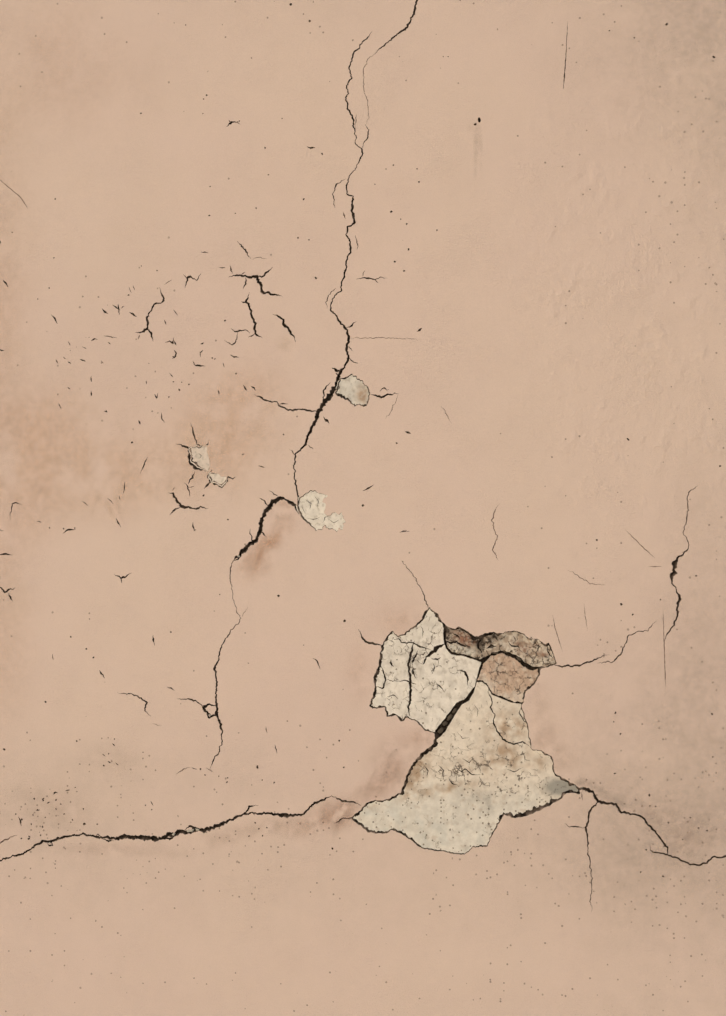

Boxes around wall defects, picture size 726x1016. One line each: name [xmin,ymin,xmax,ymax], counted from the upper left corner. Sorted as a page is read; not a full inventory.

crack [52,241,296,424]
crack [168,0,422,773]
spalling [333,374,370,407]
spalling [188,445,228,487]
spalling [295,490,346,532]
crack [99,670,157,725]
spalling [351,607,583,855]
crack [0,790,358,861]
crack [566,787,726,906]